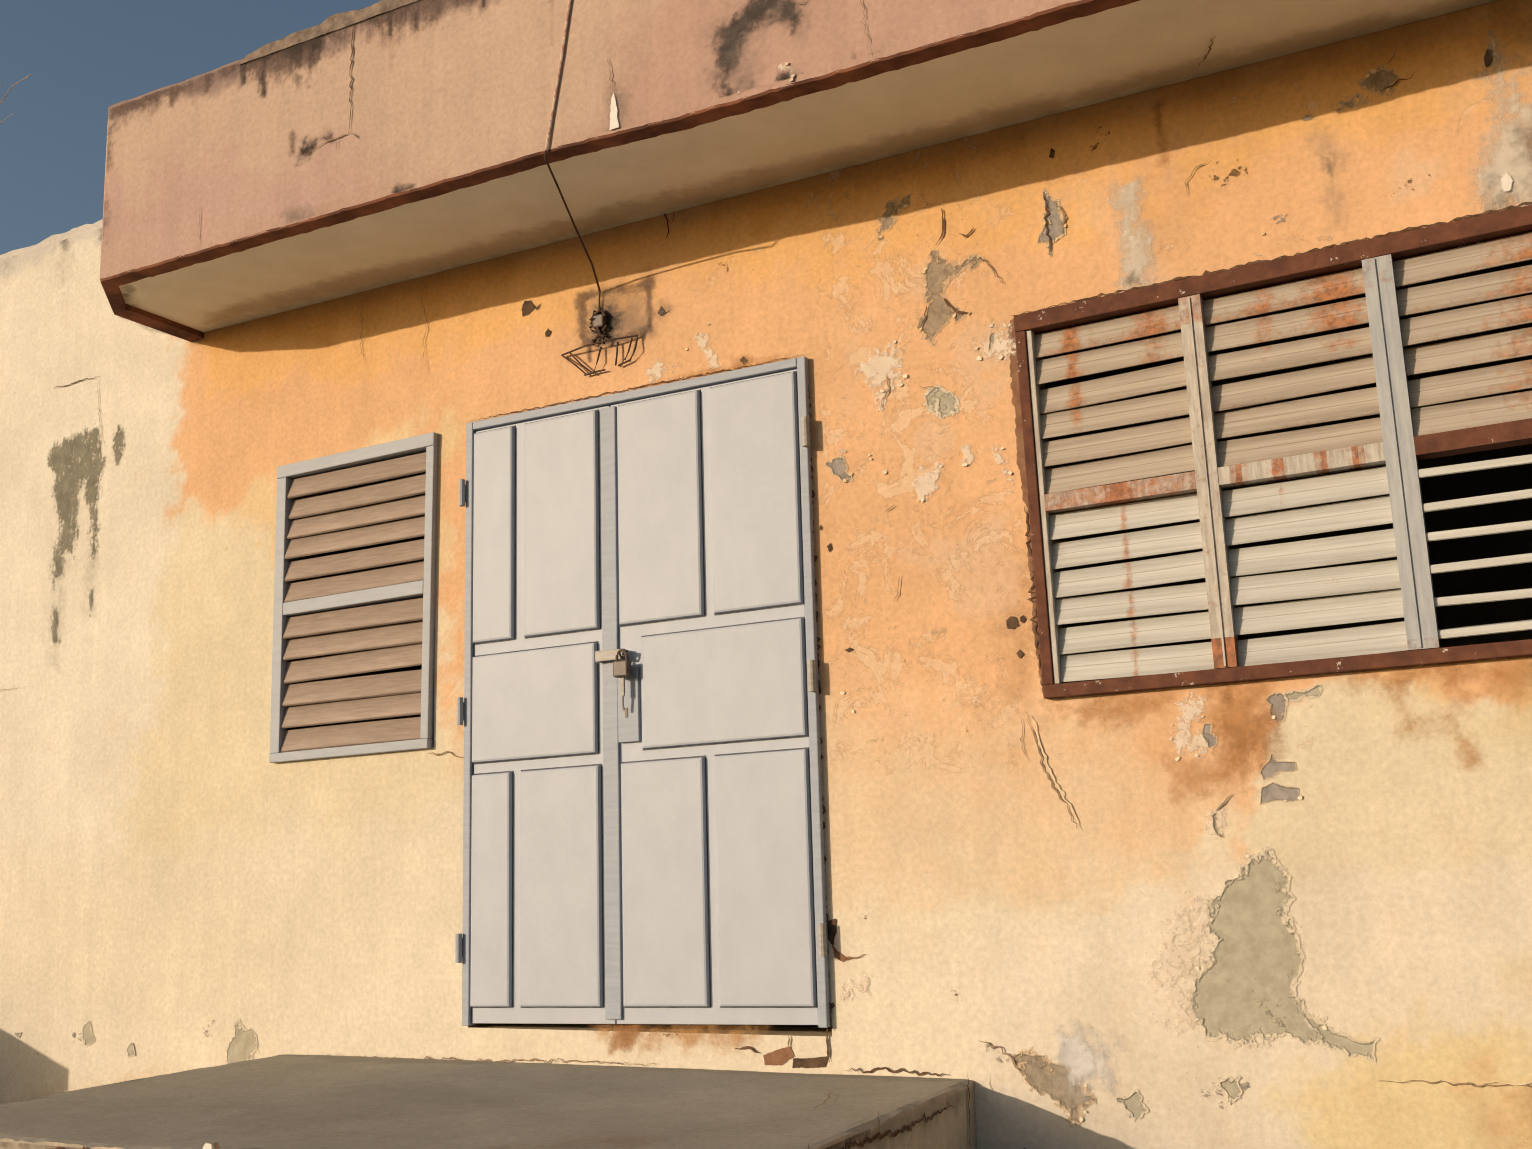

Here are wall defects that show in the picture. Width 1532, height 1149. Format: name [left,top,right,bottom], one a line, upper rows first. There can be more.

damp [112,28,343,111]
damp [371,0,484,35]
damp [716,0,798,96]
peeling [1037,188,1067,256]
peeling [916,204,1003,346]
spalling [975,319,1045,700]
damp [51,607,59,643]
peeling [1147,846,1380,1062]
crack [327,1053,656,1066]
crack [808,1067,971,1149]
peeling [978,1027,1150,1128]
crack [1381,1080,1532,1088]